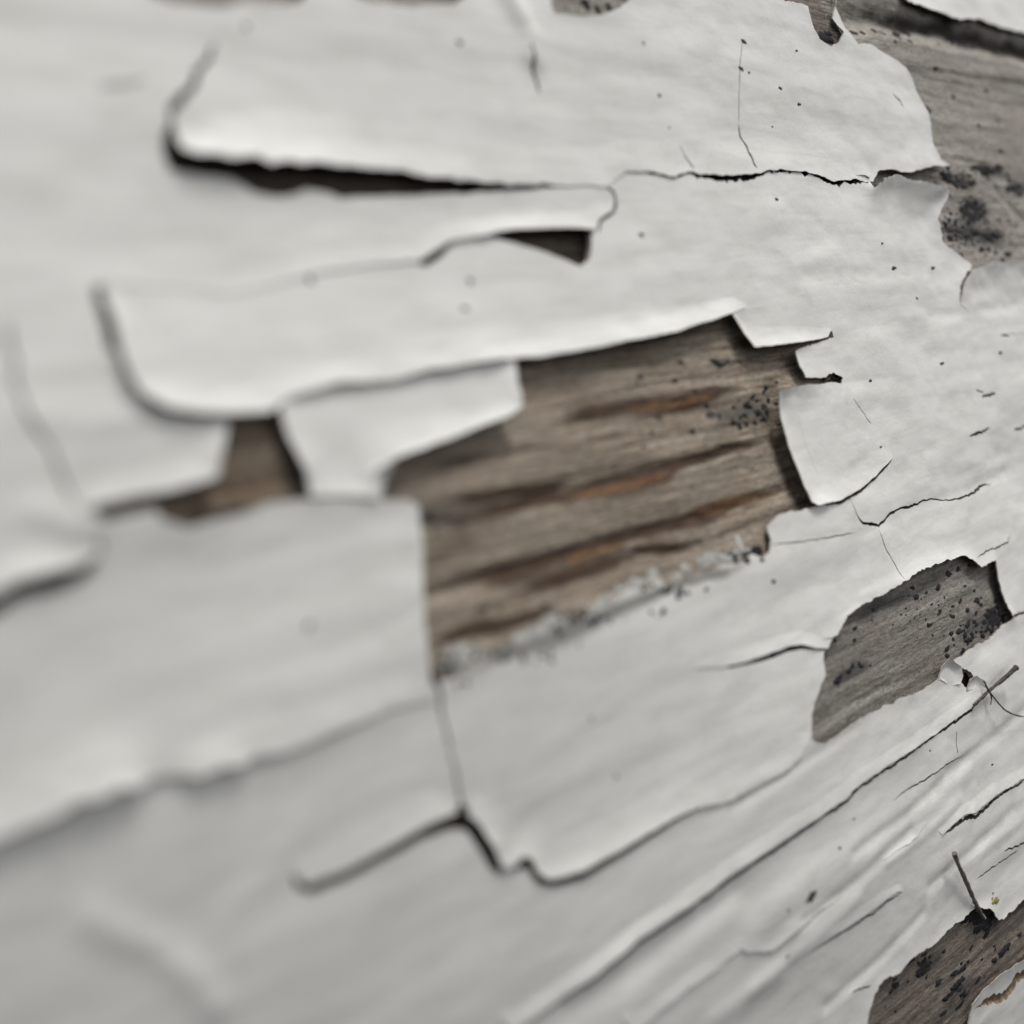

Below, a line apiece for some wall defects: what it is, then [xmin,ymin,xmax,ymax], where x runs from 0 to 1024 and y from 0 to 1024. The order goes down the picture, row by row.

peeling [167,0,1024,315]
peeling [0,189,893,838]
crack [768,484,990,572]
peeling [288,556,1024,1024]
crack [529,695,987,1024]
crack [943,779,1024,837]